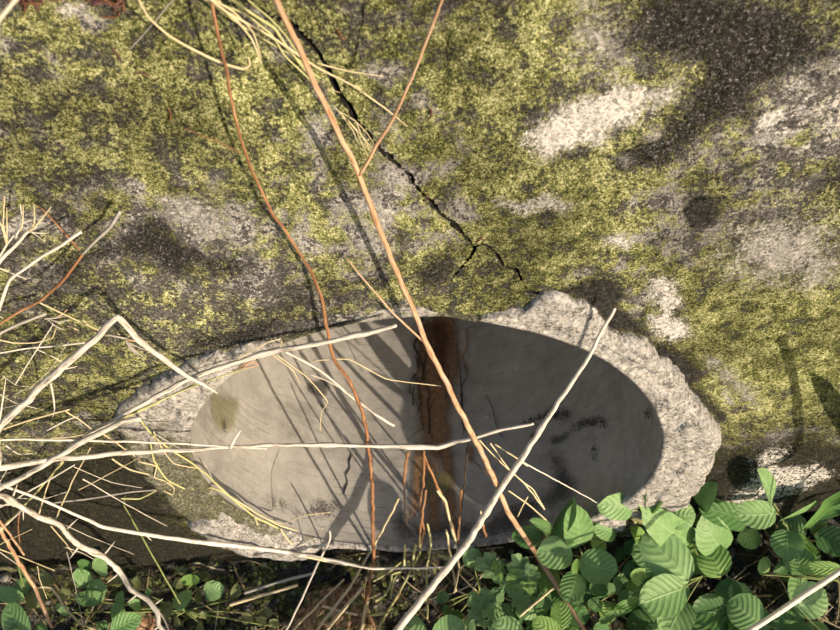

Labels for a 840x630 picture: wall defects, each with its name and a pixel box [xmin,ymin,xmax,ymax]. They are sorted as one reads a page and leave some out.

crack [241,0,539,295]
corrosion [411,316,459,527]